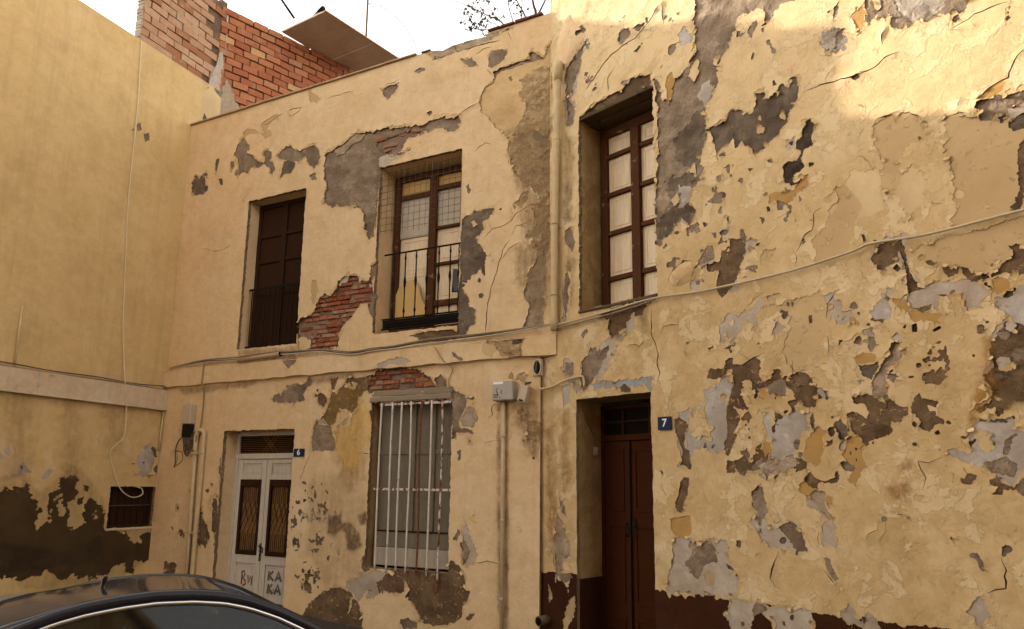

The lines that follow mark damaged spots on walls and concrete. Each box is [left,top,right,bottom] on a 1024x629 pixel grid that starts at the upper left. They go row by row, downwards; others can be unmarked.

flaking render [818,0,973,57]
flaking render [1004,0,1015,25]
flaking render [191,111,463,244]
flaking render [410,0,818,361]
flaking render [282,261,379,369]
peeling [661,81,1024,629]
flaking render [270,357,478,474]
water stain [0,475,151,582]
flaking render [291,481,478,629]